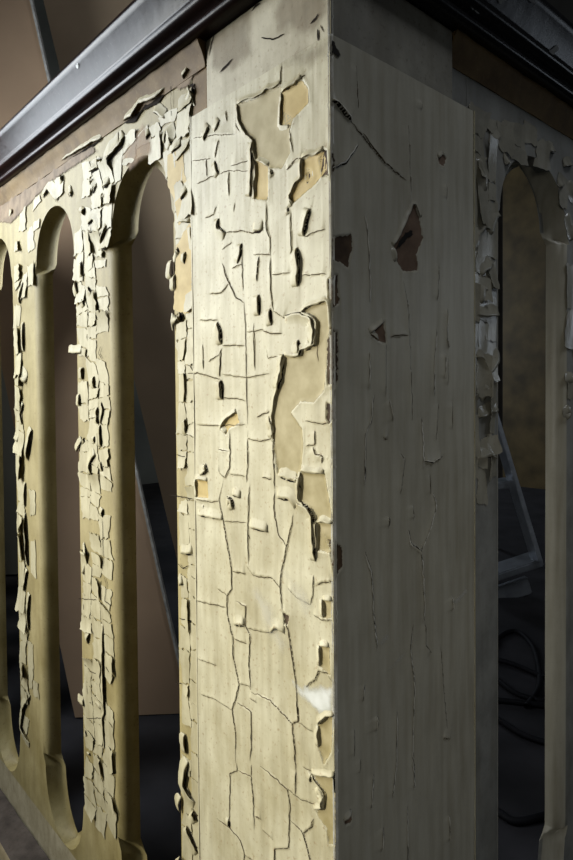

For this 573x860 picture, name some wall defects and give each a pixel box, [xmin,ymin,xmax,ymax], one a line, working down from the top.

peeling [235,75,327,204]
crack [332,82,411,180]
peeling [391,200,423,272]
peeling [469,101,573,505]
peeling [0,67,208,860]
peeling [219,409,239,434]
crack [188,112,331,860]
peeling [269,295,333,553]
crack [365,389,453,626]
peeling [316,639,330,675]
peeling [319,594,332,619]
peeling [310,710,352,844]